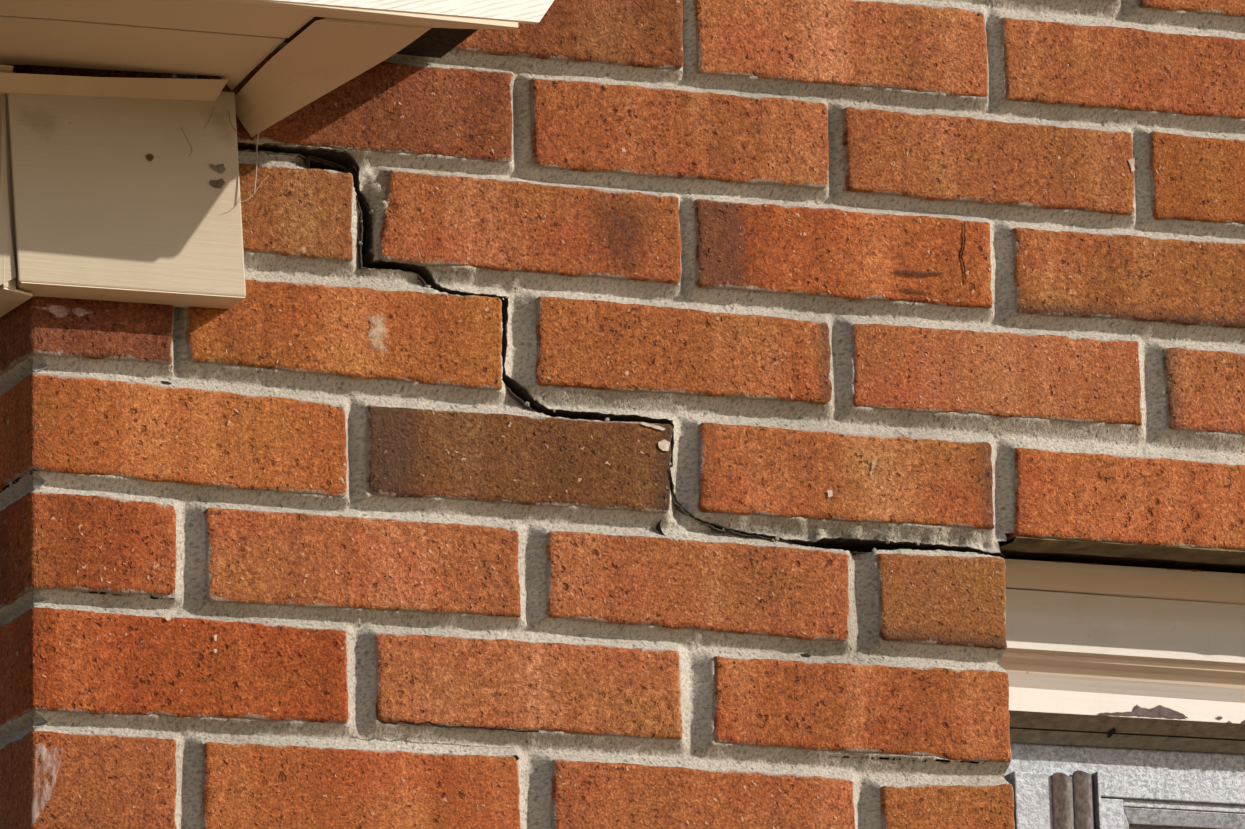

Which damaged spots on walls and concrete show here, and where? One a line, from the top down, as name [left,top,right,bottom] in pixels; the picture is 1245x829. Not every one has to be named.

crack [237,141,1005,558]
peeling [1098,705,1189,719]